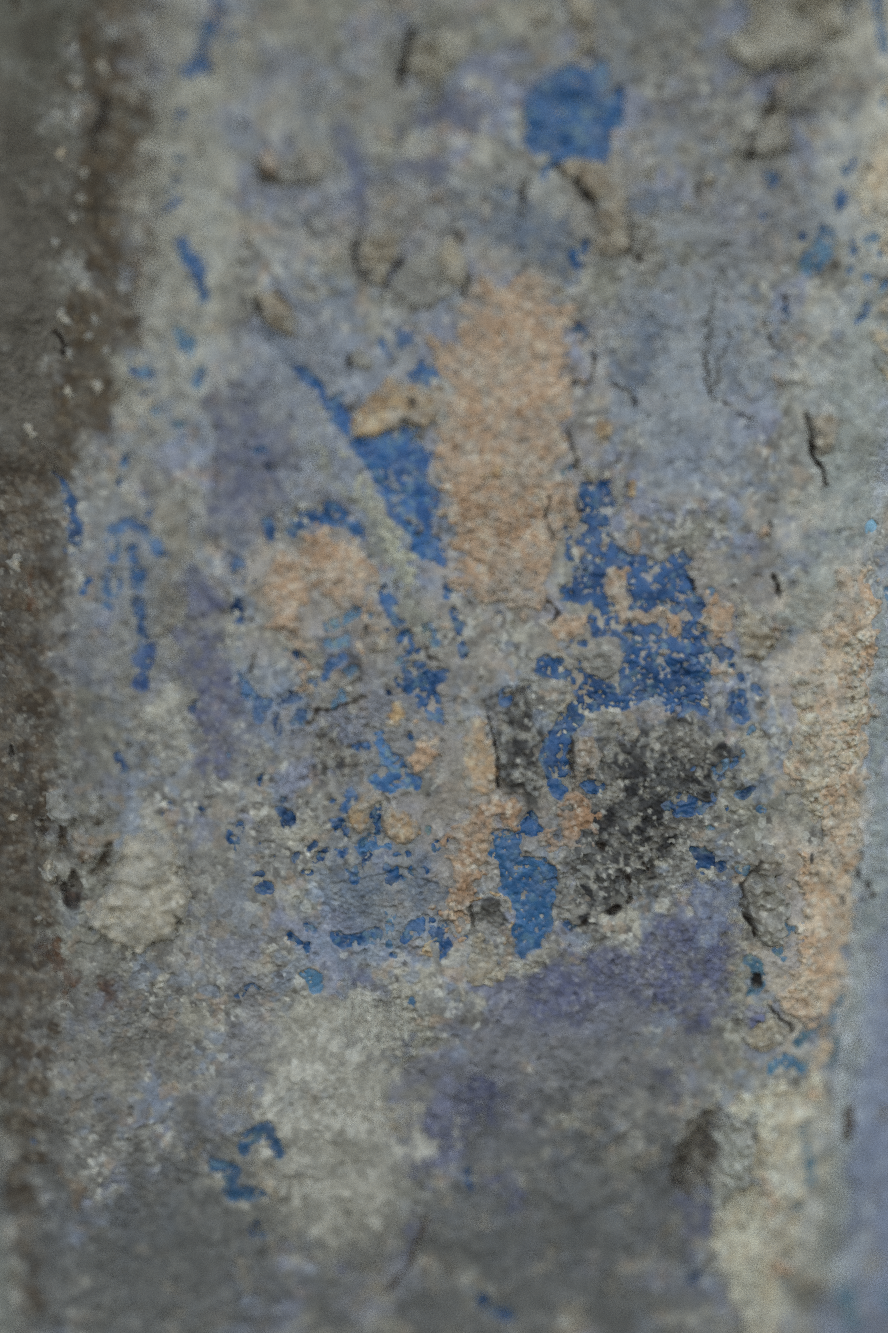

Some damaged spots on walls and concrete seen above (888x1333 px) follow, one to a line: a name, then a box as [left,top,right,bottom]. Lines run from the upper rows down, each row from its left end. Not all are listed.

flaking render [852,131,888,259]
flaking render [261,262,637,698]
crack [803,414,828,486]
peeling [230,597,245,624]
flaking render [603,530,739,656]
flaking render [384,701,444,774]
flaking render [708,559,888,1333]